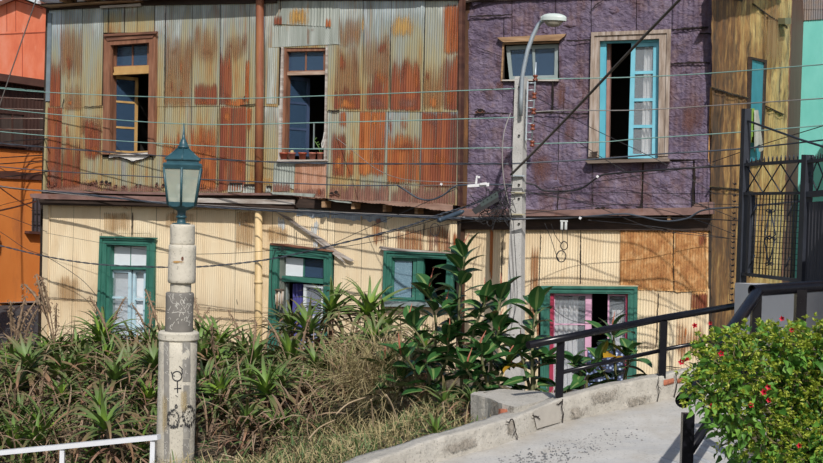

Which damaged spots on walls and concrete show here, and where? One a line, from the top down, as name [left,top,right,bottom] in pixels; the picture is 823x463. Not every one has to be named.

rust [47,36,161,192]
rust [163,5,459,204]